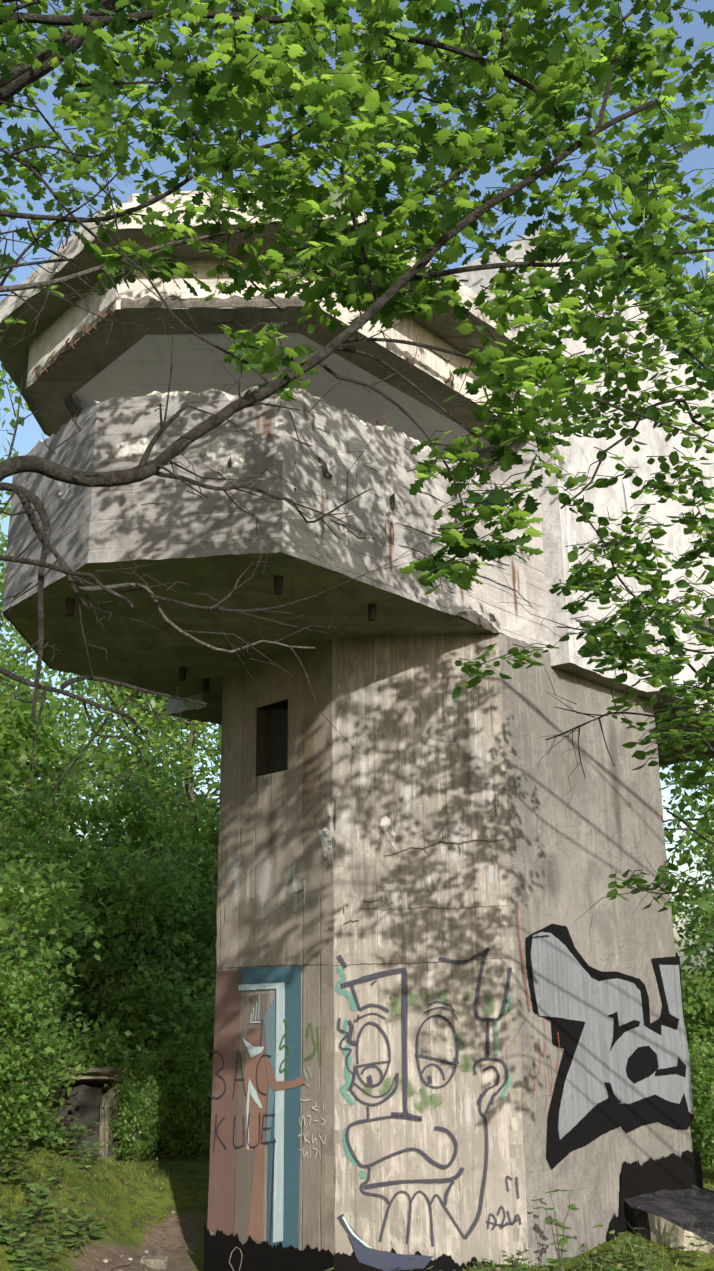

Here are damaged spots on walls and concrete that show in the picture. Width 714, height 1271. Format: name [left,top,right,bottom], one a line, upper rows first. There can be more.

spalling [294,388,432,451]
spalling [111,438,157,461]
spalling [200,436,246,484]
corrosion [385,523,394,567]
spalling [319,827,333,860]
spalling [381,816,396,847]
crack [385,839,503,857]